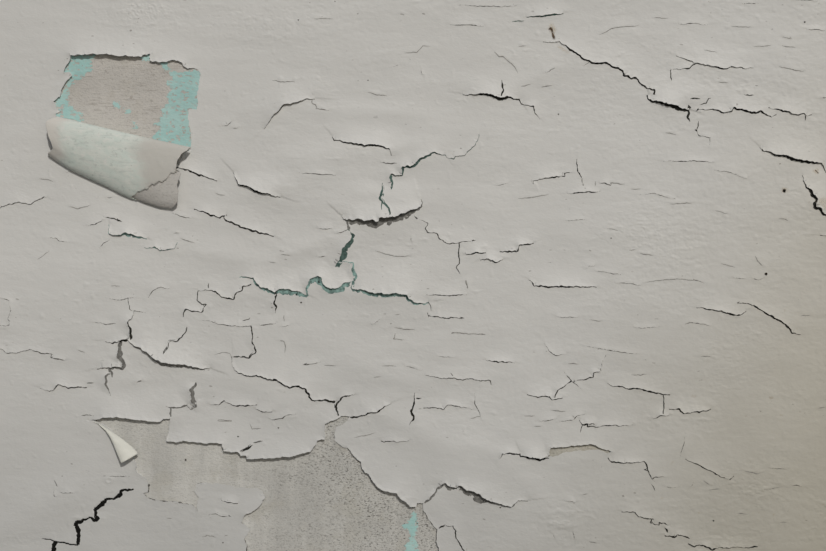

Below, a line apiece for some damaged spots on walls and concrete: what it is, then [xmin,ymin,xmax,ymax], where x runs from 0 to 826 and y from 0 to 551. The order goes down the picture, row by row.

peeling [46,50,204,209]
crack [43,489,134,551]
peeling [89,412,442,551]